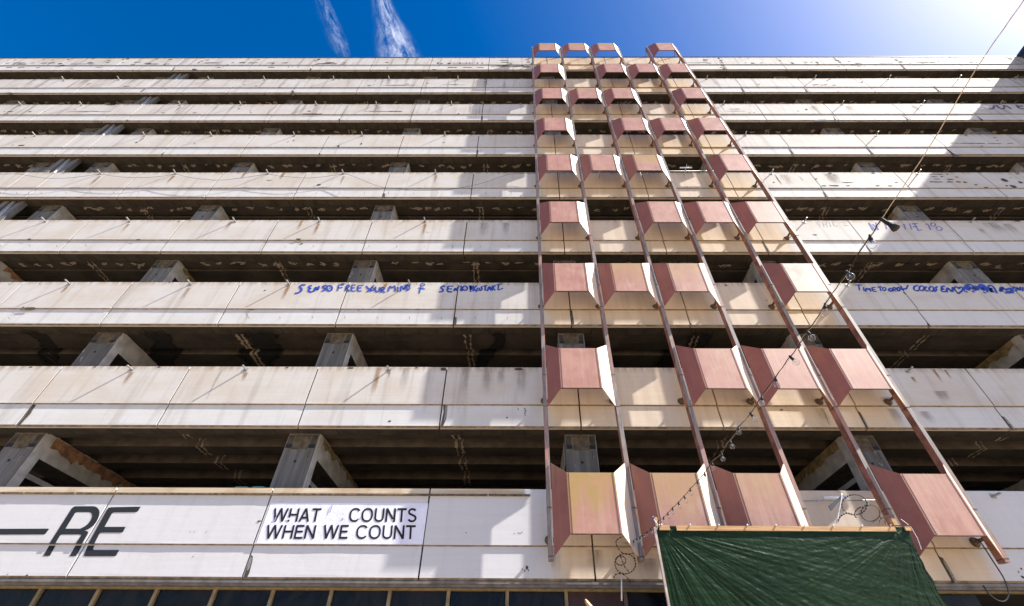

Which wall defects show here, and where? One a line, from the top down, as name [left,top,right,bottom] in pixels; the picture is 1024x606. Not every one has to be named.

flaking render [974,341,1013,369]
flaking render [50,438,136,487]